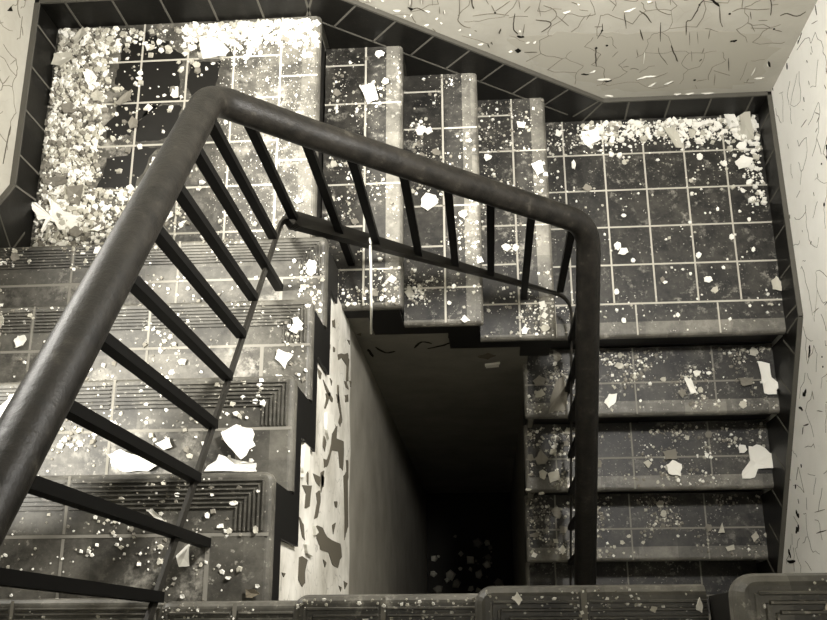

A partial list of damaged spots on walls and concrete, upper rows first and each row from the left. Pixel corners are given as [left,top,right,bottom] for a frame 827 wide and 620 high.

crack [411,0,827,132]
flaking render [279,296,361,601]